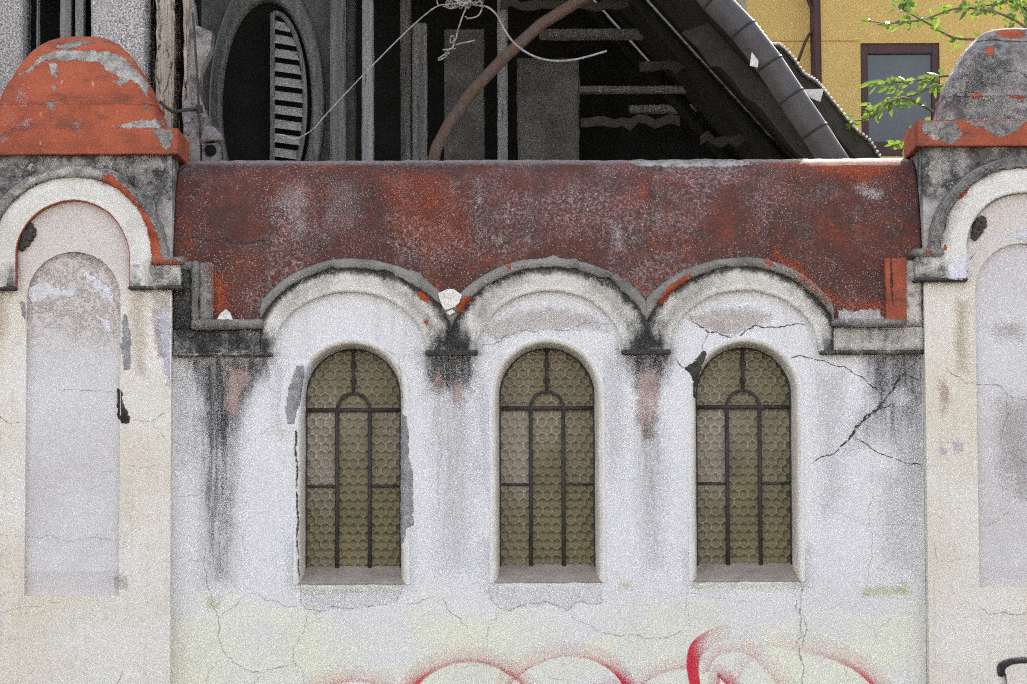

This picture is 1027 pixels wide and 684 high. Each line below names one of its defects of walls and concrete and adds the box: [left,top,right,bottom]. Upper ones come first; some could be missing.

peeling [19,0,193,150]
peeling [986,28,1026,56]
peeling [626,160,752,168]
peeling [928,157,947,184]
peeling [922,118,1027,144]
peeling [657,272,691,306]
crack [690,317,805,349]
damp [180,283,270,576]
spalling [278,357,311,575]
spalling [400,410,420,549]
damp [616,318,674,497]
crack [791,355,922,466]